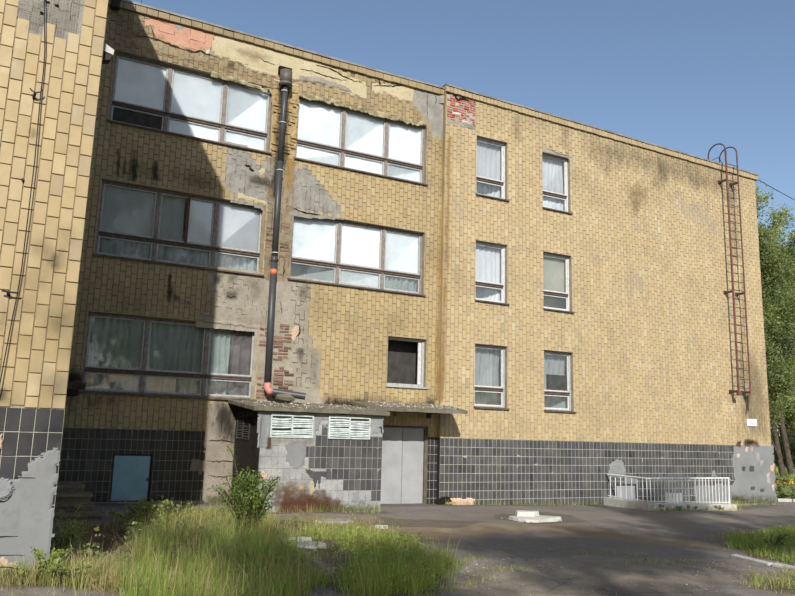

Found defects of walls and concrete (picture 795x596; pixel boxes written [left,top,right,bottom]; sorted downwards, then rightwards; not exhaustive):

flaking render [3,0,91,47]
crack [125,25,216,57]
spalling [144,17,476,404]
peeling [190,397,240,503]
peeling [285,440,327,495]
peeling [732,444,777,505]